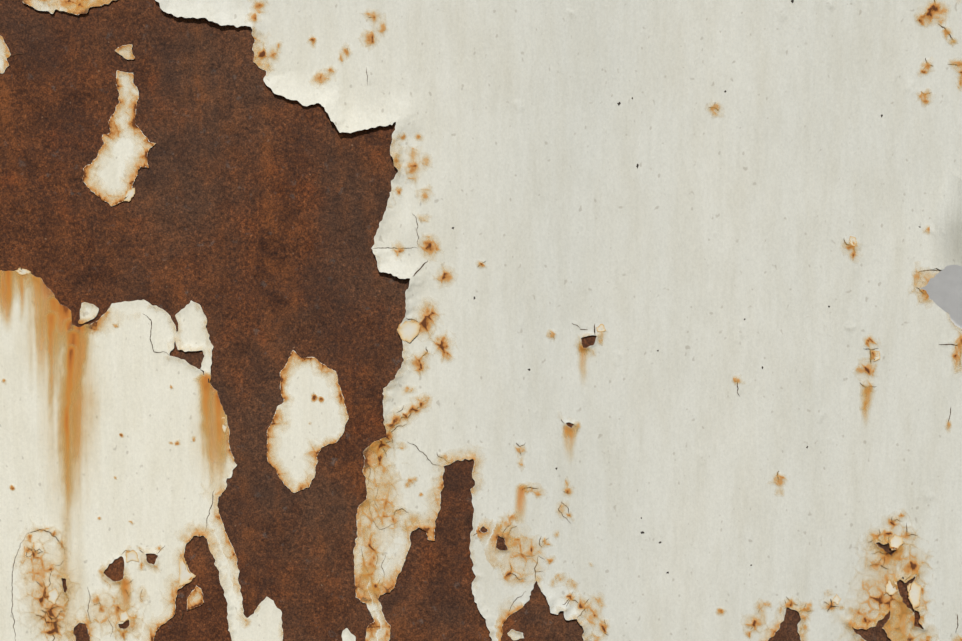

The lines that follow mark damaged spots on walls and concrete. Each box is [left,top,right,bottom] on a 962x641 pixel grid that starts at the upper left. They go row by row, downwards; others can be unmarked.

corrosion [41,0,101,10]
corrosion [365,12,386,45]
corrosion [917,0,947,25]
corrosion [257,44,279,66]
corrosion [421,236,439,254]
peeling [914,167,962,366]
peeling [0,0,607,641]
corrosion [0,270,87,488]
corrosion [856,337,880,410]
corrosion [199,374,224,461]
corrosion [561,420,579,439]